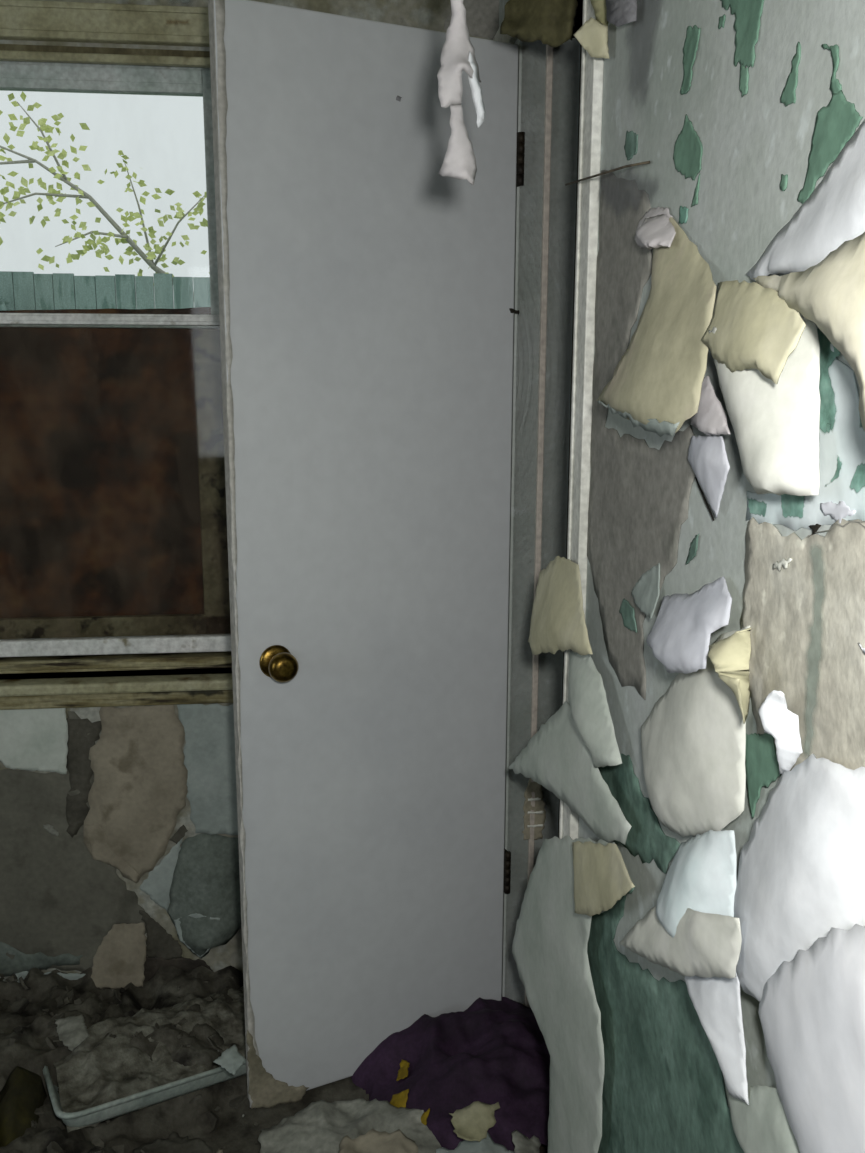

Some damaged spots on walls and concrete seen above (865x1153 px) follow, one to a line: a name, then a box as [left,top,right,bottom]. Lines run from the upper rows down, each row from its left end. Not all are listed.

peeling [680,25,701,95]
peeling [718,0,764,97]
peeling [780,42,863,204]
flaking render [587,114,703,700]
flaking render [740,326,865,819]
flaking render [0,703,238,983]
flaking render [522,778,546,840]
peeling [598,753,680,874]
peeling [587,887,744,1153]